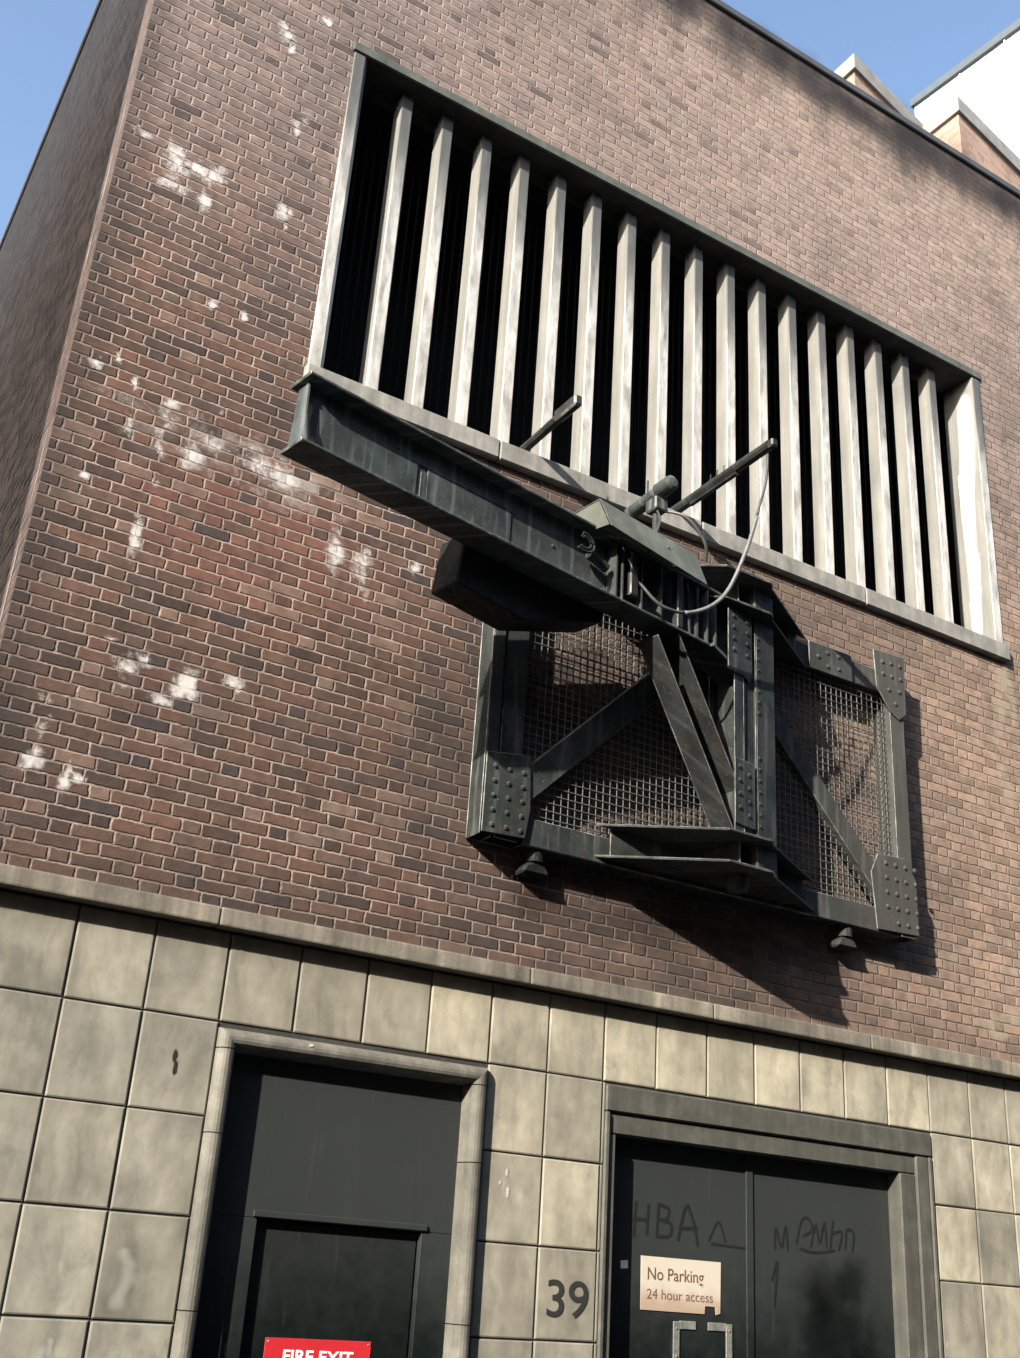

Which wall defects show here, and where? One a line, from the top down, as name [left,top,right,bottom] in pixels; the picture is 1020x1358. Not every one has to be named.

damp [278,21,298,54]
damp [120,107,229,214]
damp [82,352,374,602]
damp [107,636,203,707]
damp [220,676,246,694]
damp [19,694,53,772]
damp [56,764,88,791]